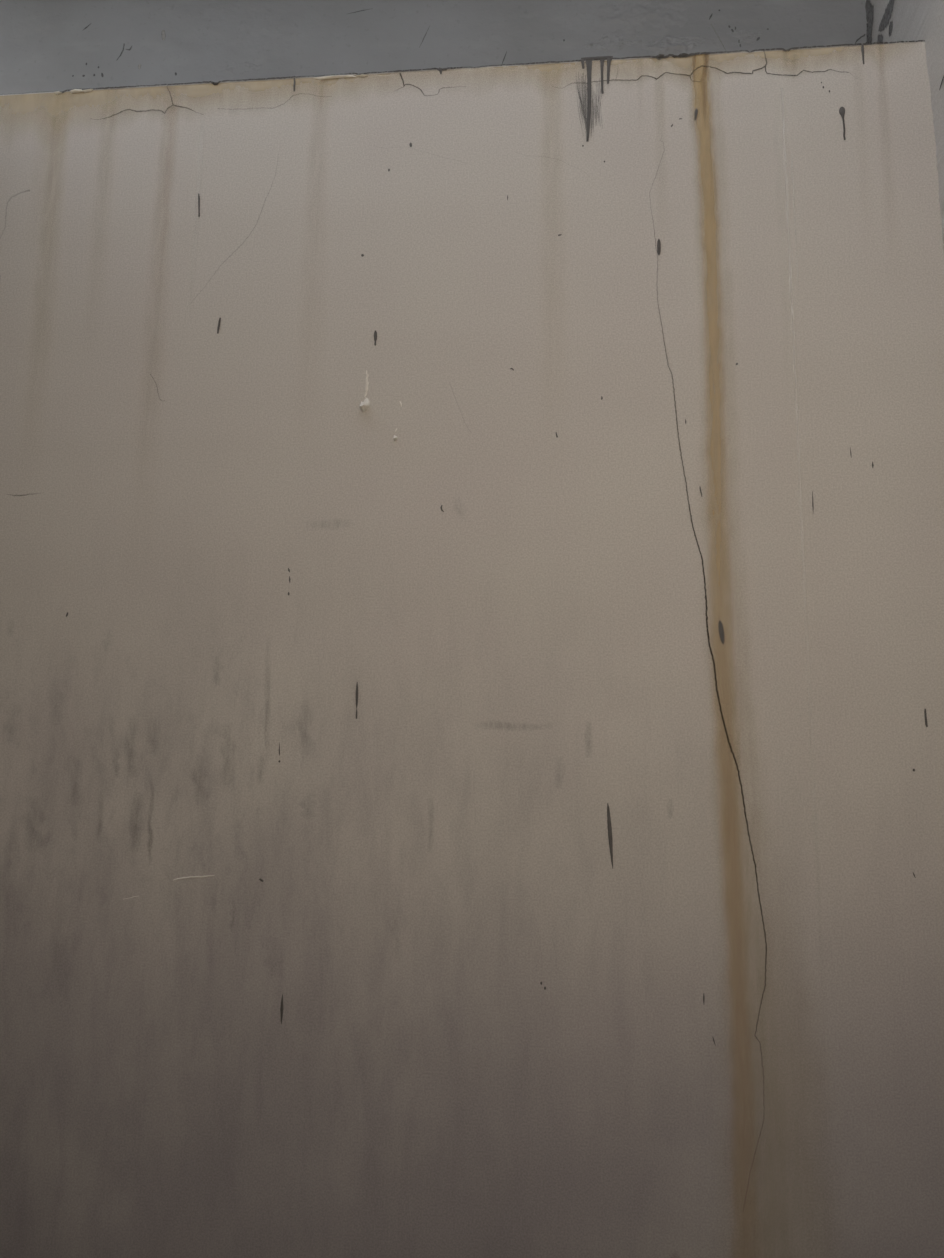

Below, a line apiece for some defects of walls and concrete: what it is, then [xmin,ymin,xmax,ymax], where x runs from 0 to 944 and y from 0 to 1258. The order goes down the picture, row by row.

crack [59,34,925,115]
rust [694,54,720,490]
crack [667,360,767,1038]